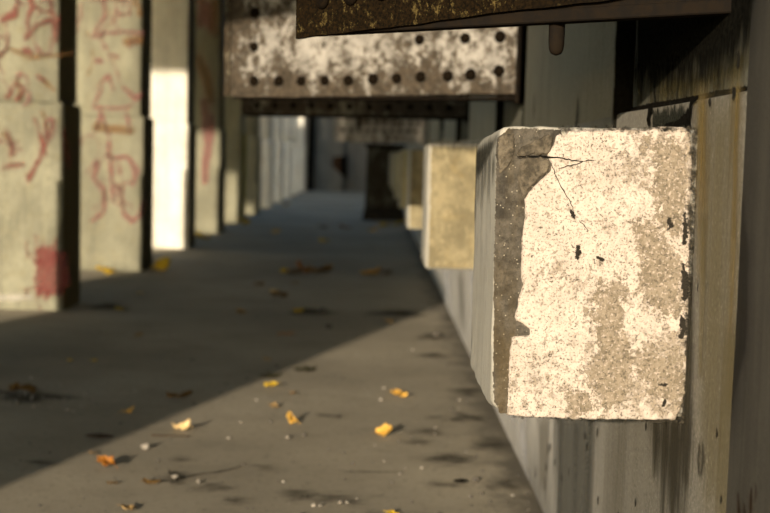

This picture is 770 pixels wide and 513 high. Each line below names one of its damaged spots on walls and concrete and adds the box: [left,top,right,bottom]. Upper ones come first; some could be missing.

spalling [492,128,562,414]
crack [517,155,594,231]
water stain [641,279,703,513]